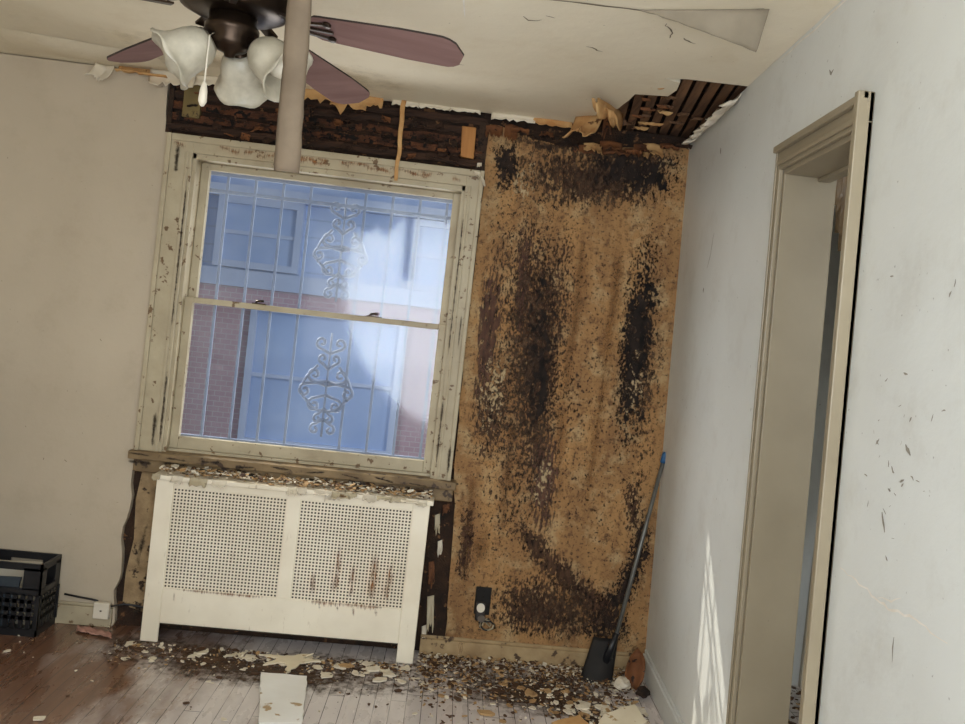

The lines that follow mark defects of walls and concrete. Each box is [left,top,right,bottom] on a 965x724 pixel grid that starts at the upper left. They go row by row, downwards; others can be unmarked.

flaking render [84,62,279,144]
flaking render [123,472,227,614]
flaking render [286,79,742,654]
water stain [455,135,683,643]